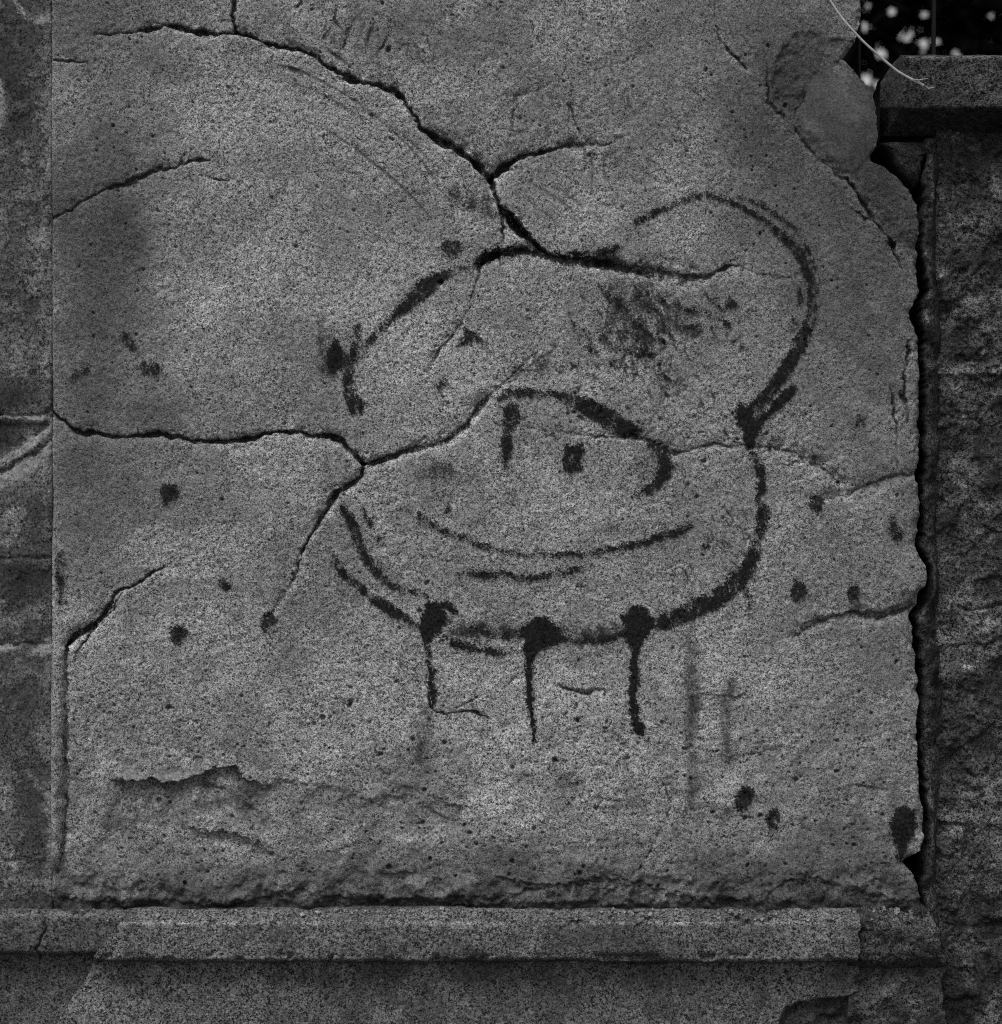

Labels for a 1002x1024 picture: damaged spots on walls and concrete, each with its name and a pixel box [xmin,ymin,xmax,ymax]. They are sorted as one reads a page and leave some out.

crack [53,0,912,614]
crack [797,604,913,636]
spalling [105,764,264,825]